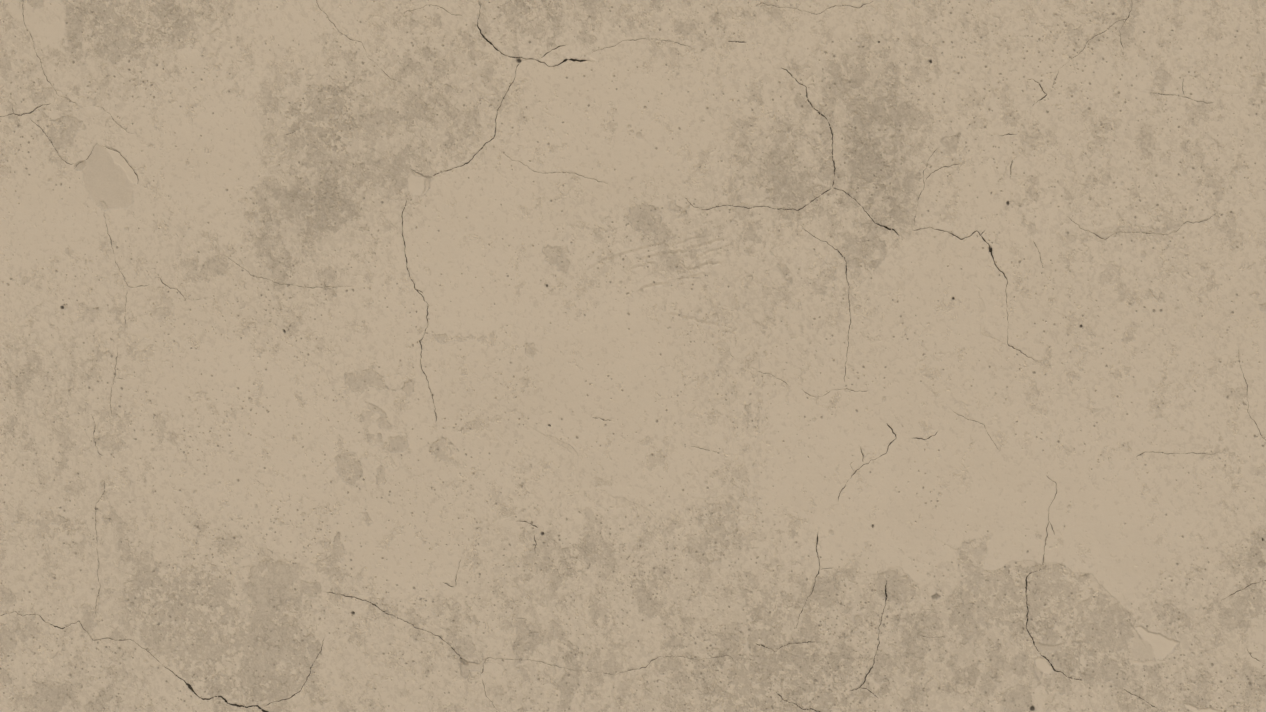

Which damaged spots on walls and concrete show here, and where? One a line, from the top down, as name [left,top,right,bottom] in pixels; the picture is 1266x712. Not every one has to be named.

crack [412,4,690,184]
crack [402,198,437,420]
crack [686,68,1034,397]
crack [0,216,323,712]
peeling [875,572,915,609]
peeling [957,554,1179,712]